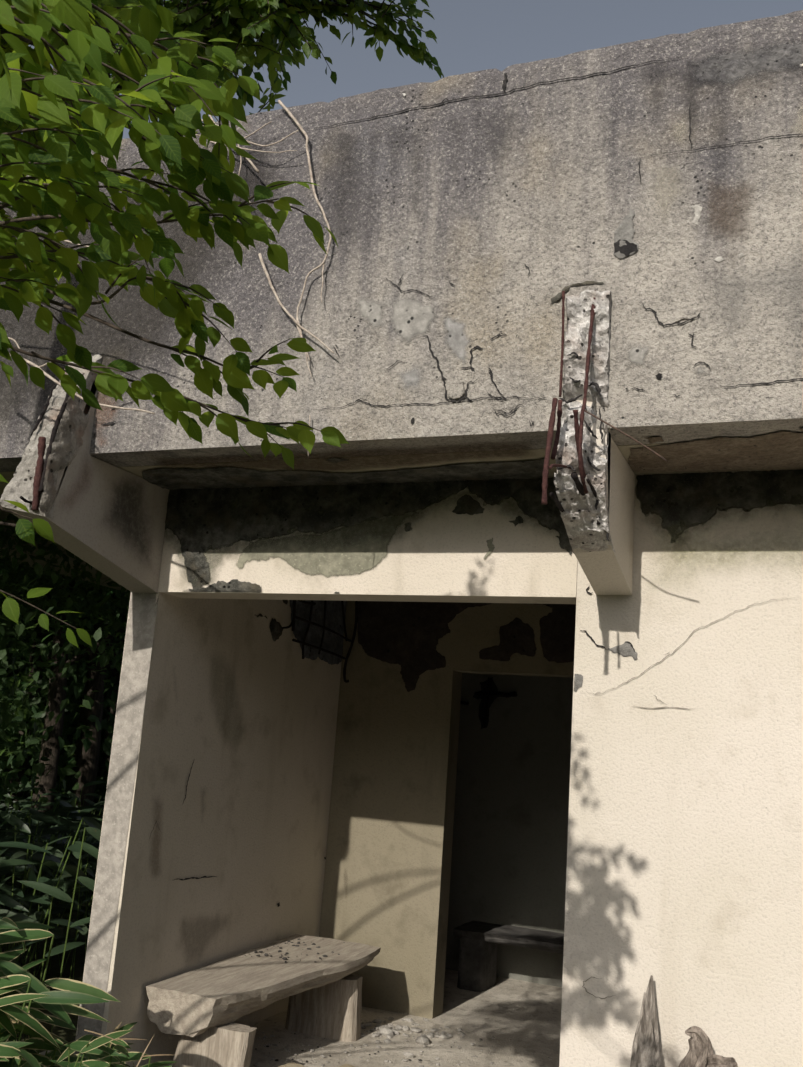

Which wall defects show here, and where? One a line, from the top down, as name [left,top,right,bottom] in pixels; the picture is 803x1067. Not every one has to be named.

spalling [613,209,638,259]
crack [385,276,455,298]
crack [316,333,547,426]
crack [641,298,803,388]
spalling [0,354,103,519]
peeling [142,281,803,592]
peeling [256,592,492,692]
peeling [479,604,583,692]
peeling [608,641,637,660]
crack [580,598,789,709]
crack [174,874,216,882]